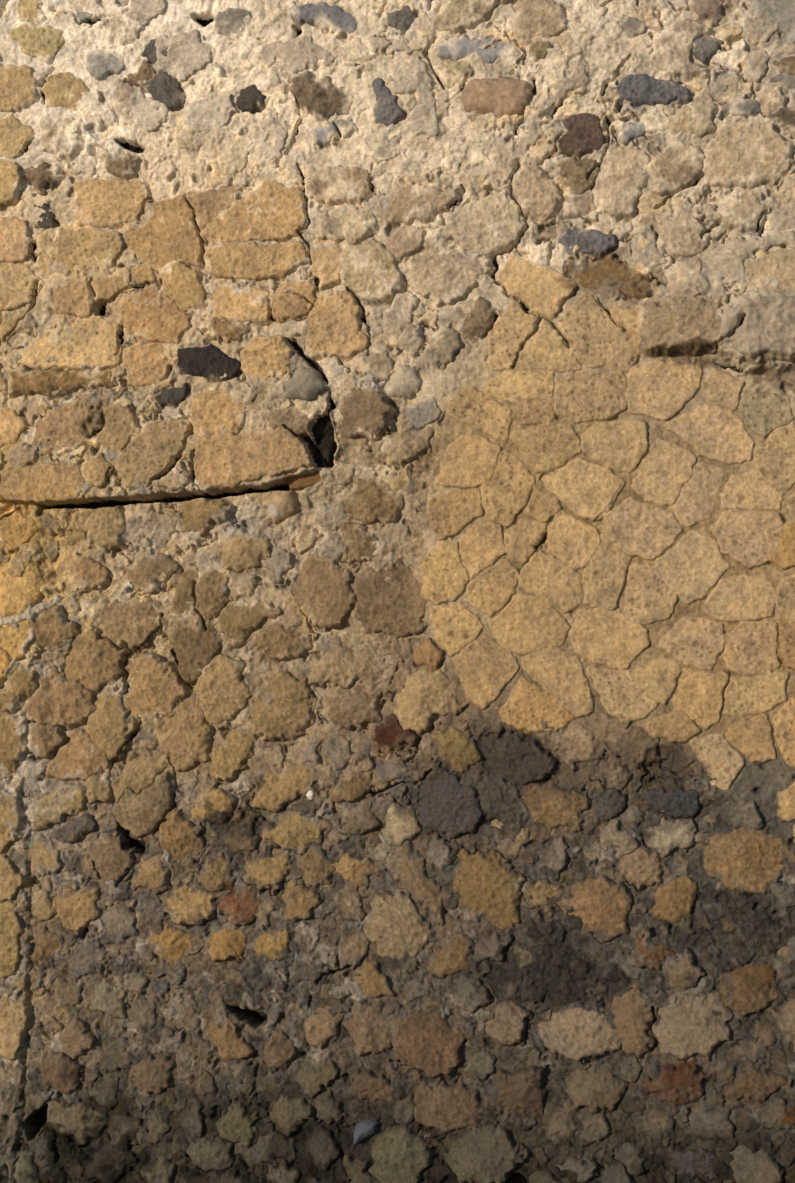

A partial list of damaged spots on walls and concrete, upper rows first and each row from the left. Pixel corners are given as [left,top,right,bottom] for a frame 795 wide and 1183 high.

crack [31,242,39,308]
crack [117,327,125,345]
crack [270,315,336,455]
crack [157,455,196,481]